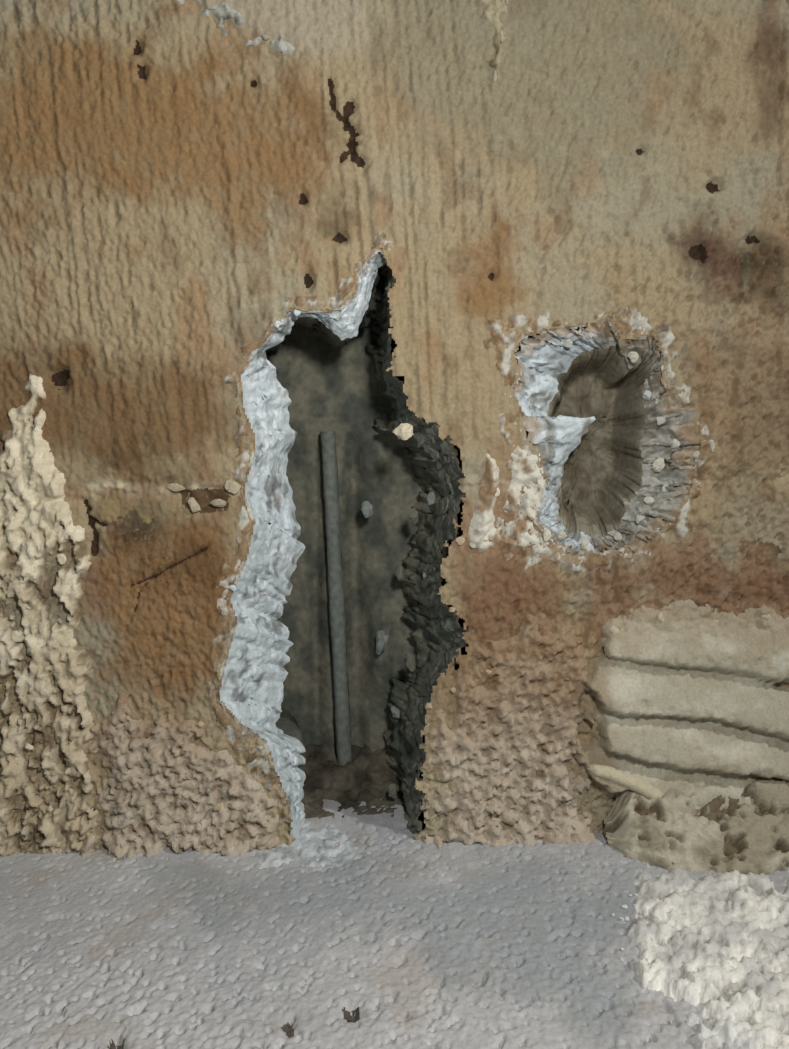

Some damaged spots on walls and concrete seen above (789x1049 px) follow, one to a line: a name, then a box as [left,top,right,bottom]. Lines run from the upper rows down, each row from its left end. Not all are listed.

spalling [52,368,69,390]
spalling [79,231,715,860]